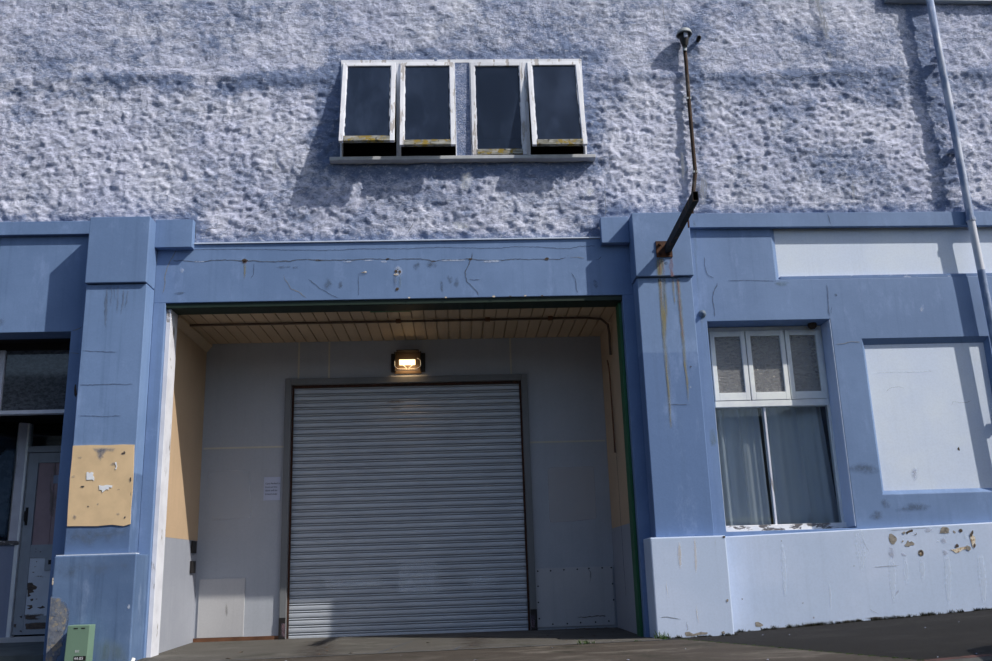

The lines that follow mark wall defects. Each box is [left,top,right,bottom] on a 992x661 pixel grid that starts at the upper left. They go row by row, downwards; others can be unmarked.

crack [163,224,601,298]
rust [657,259,689,422]
spalling [889,530,924,556]
spalling [940,527,976,553]
spalling [14,551,69,661]